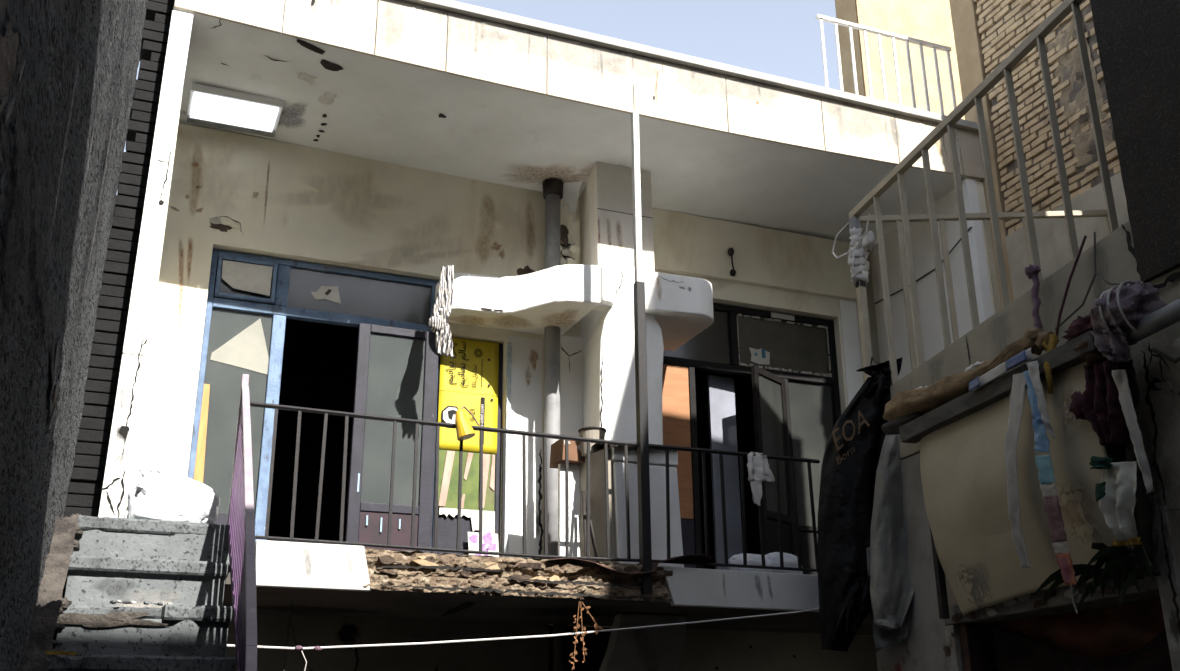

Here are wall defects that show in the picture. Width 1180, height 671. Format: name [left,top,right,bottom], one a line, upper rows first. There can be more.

spalling [0,0,26,124]
peeling [296,39,343,71]
leakage [378,6,772,115]
peeling [313,94,336,141]
crack [155,144,173,205]
peeling [210,216,242,232]
crack [100,327,148,518]
crack [1141,342,1180,635]
spalling [363,549,673,603]